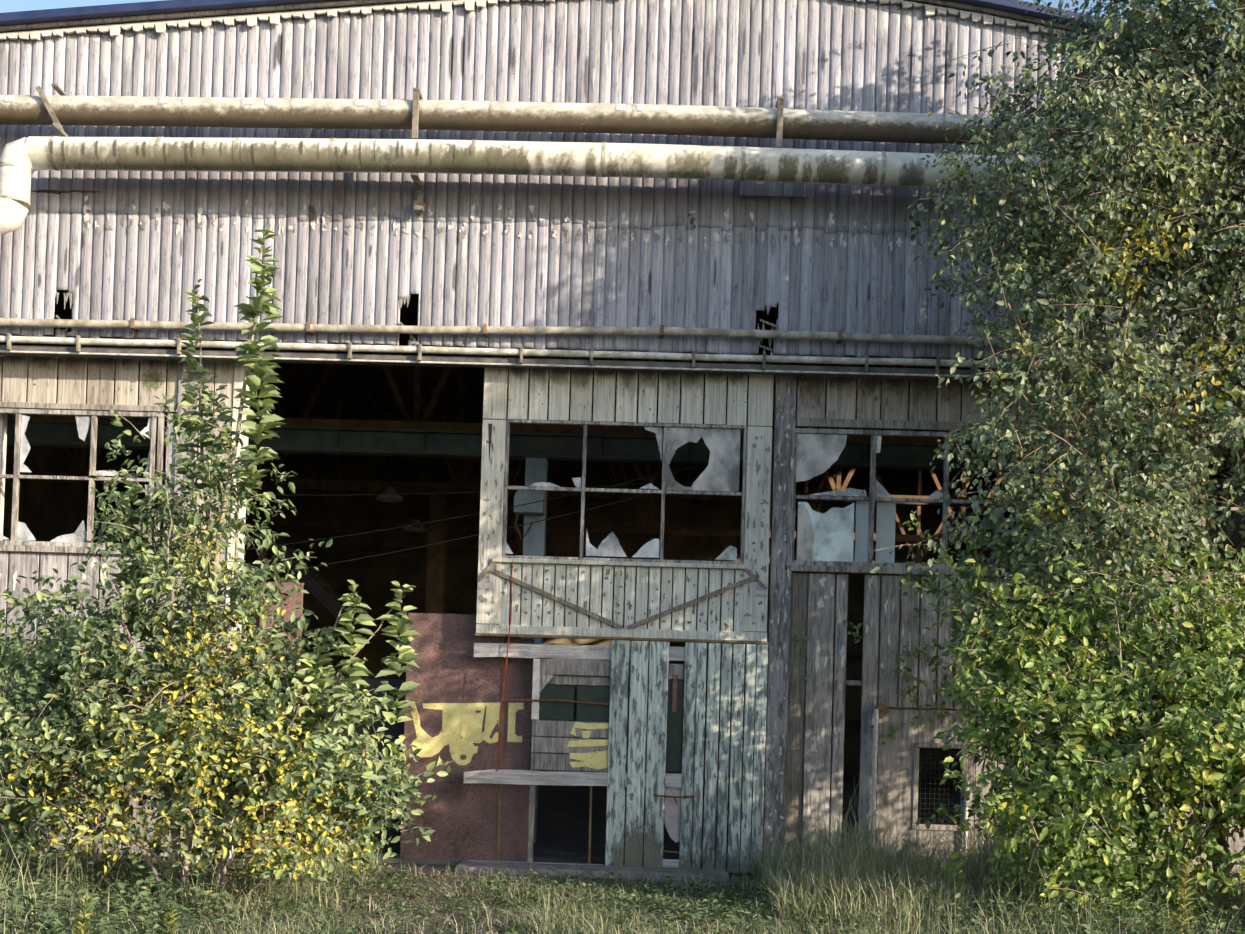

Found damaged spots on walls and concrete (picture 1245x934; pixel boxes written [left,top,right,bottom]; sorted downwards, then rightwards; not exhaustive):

water stain [667,153,710,179]
water stain [724,155,849,183]
water stain [863,161,877,185]
water stain [899,163,924,186]
peeling [83,195,916,251]
peeling [478,426,587,619]
peeling [603,387,795,631]
peeling [815,639,845,673]
peeling [881,661,944,703]
peeling [609,642,666,863]
peeling [681,643,787,865]
peeling [807,792,837,831]